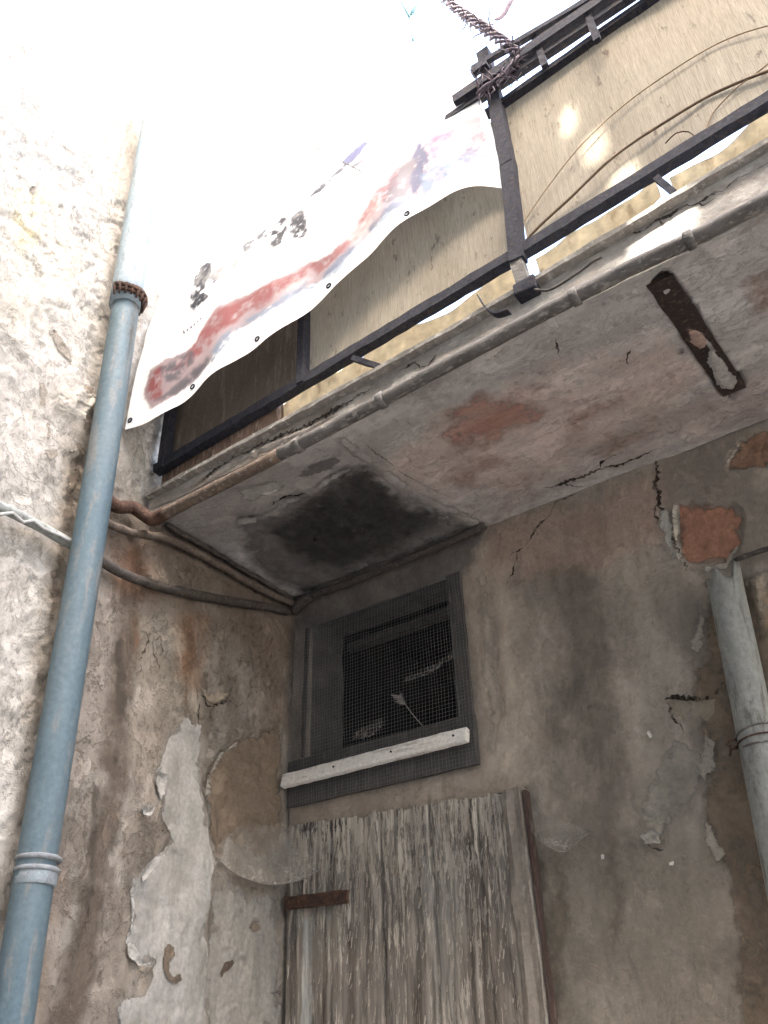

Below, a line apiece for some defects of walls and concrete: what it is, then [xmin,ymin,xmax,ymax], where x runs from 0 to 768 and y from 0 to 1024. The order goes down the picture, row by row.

spalling [727,432,768,469]
damp [236,467,463,591]
crack [507,449,688,583]
spalling [671,504,742,587]
spalling [743,580,768,692]
peeling [117,717,215,1024]
peeling [640,829,664,851]
spalling [691,600,768,1024]
spalling [220,960,234,977]